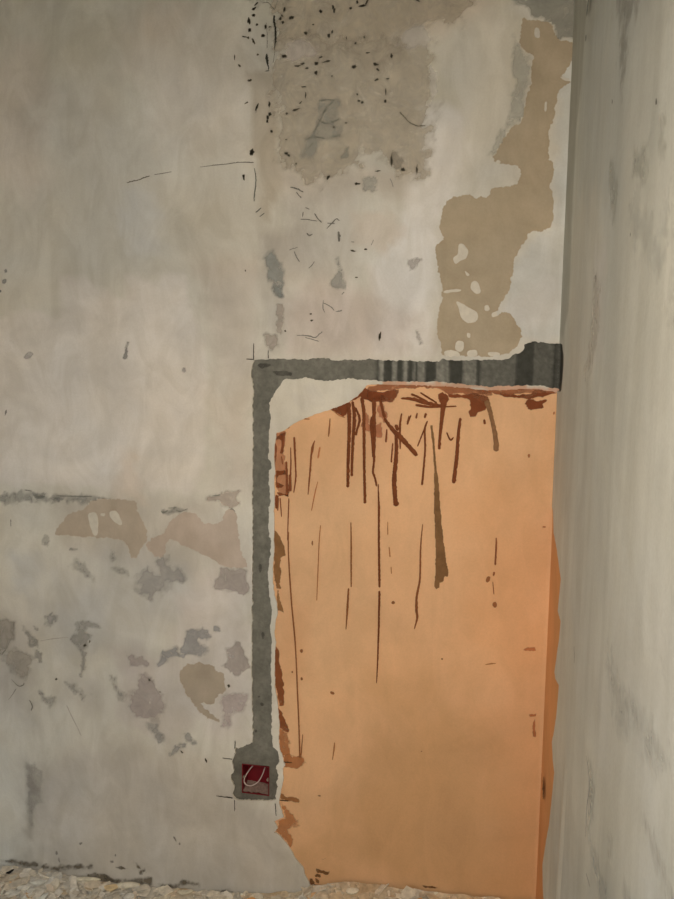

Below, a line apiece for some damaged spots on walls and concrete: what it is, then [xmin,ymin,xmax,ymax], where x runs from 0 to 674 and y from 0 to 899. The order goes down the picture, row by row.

spalling [242,2,294,56]
crack [263,0,278,71]
crack [204,162,264,217]
peeling [435,18,573,357]
rust [331,384,555,438]
peeling [55,498,247,569]
peeling [273,384,561,899]
peeling [179,662,230,722]